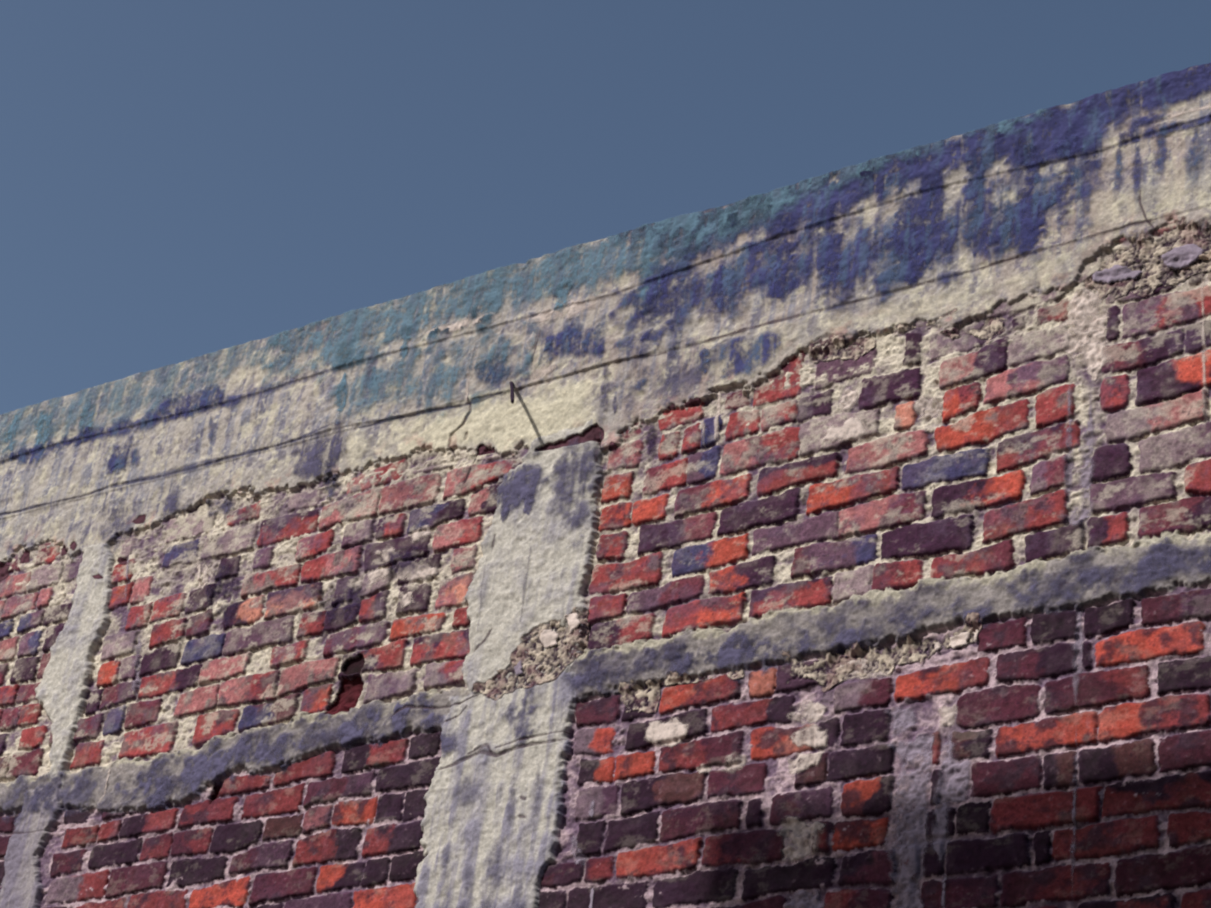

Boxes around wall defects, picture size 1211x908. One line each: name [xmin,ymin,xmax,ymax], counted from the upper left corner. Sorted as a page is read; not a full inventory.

water stain [0,63,1211,497]
spalling [1085,216,1211,299]
spalling [808,333,875,363]
crack [0,426,327,515]
crack [360,392,512,483]
water stain [497,447,601,526]
spalling [325,654,365,715]
spalling [473,607,589,700]
water stain [2,694,456,820]
crack [438,731,570,770]
water stain [646,718,687,746]
water stain [789,700,826,774]